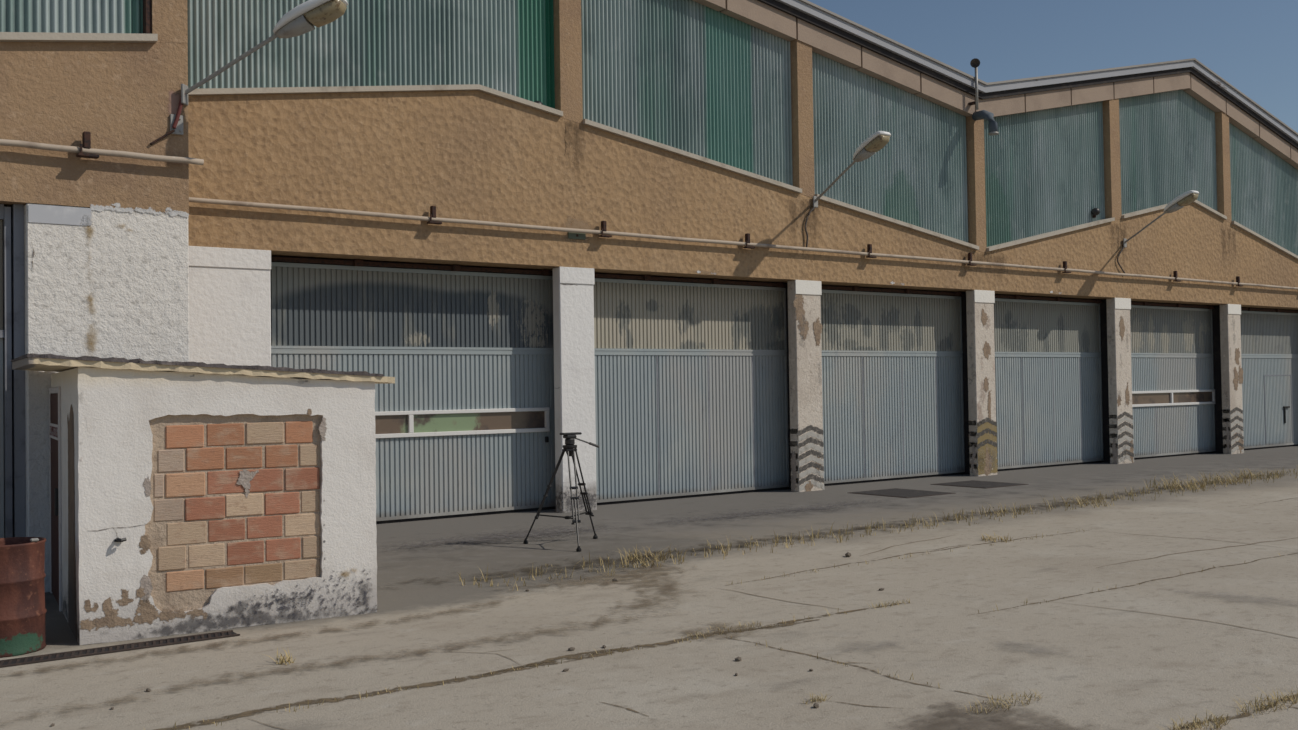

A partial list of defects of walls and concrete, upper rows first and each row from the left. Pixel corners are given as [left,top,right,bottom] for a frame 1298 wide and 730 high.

flaking render [793,294,823,345]
flaking render [981,309,991,359]
flaking render [984,377,992,419]
flaking render [67,405,208,640]